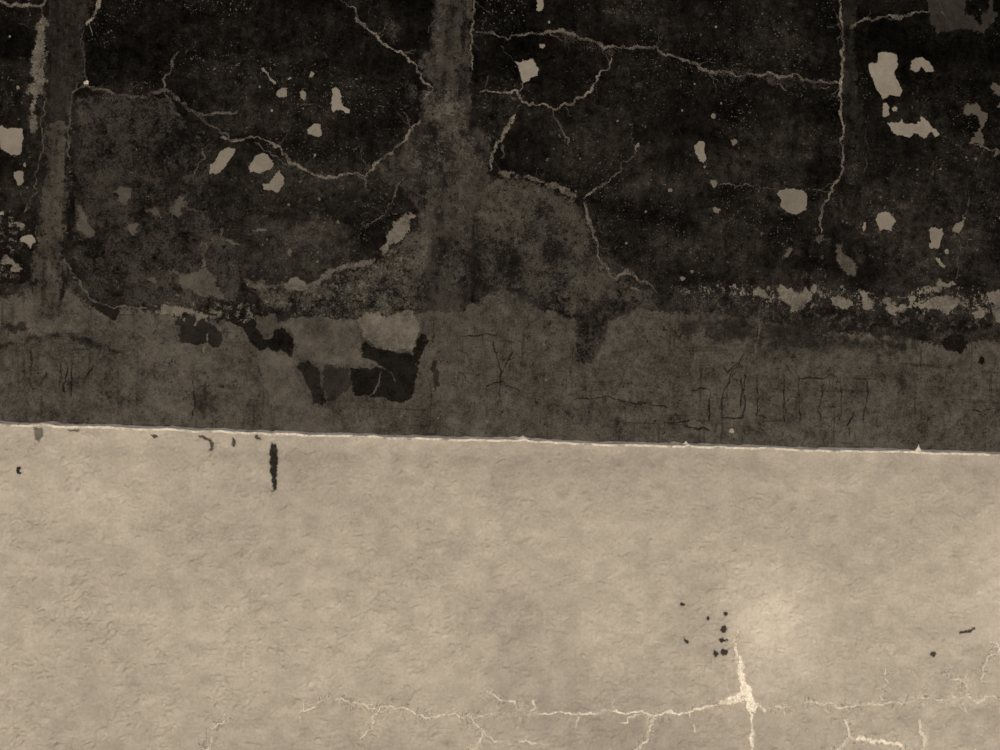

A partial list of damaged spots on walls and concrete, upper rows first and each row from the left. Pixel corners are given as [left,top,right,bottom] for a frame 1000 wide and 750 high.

flaking render [0,212,36,286]
crack [0,0,47,29]
crack [24,0,448,294]
peeling [69,91,425,405]
peeling [514,59,539,84]
crack [584,143,657,293]
crack [469,0,930,233]
peeling [472,177,992,364]
peeling [868,52,939,138]
crack [941,135,1000,278]
flaking render [350,334,440,403]
crack [298,630,1000,750]